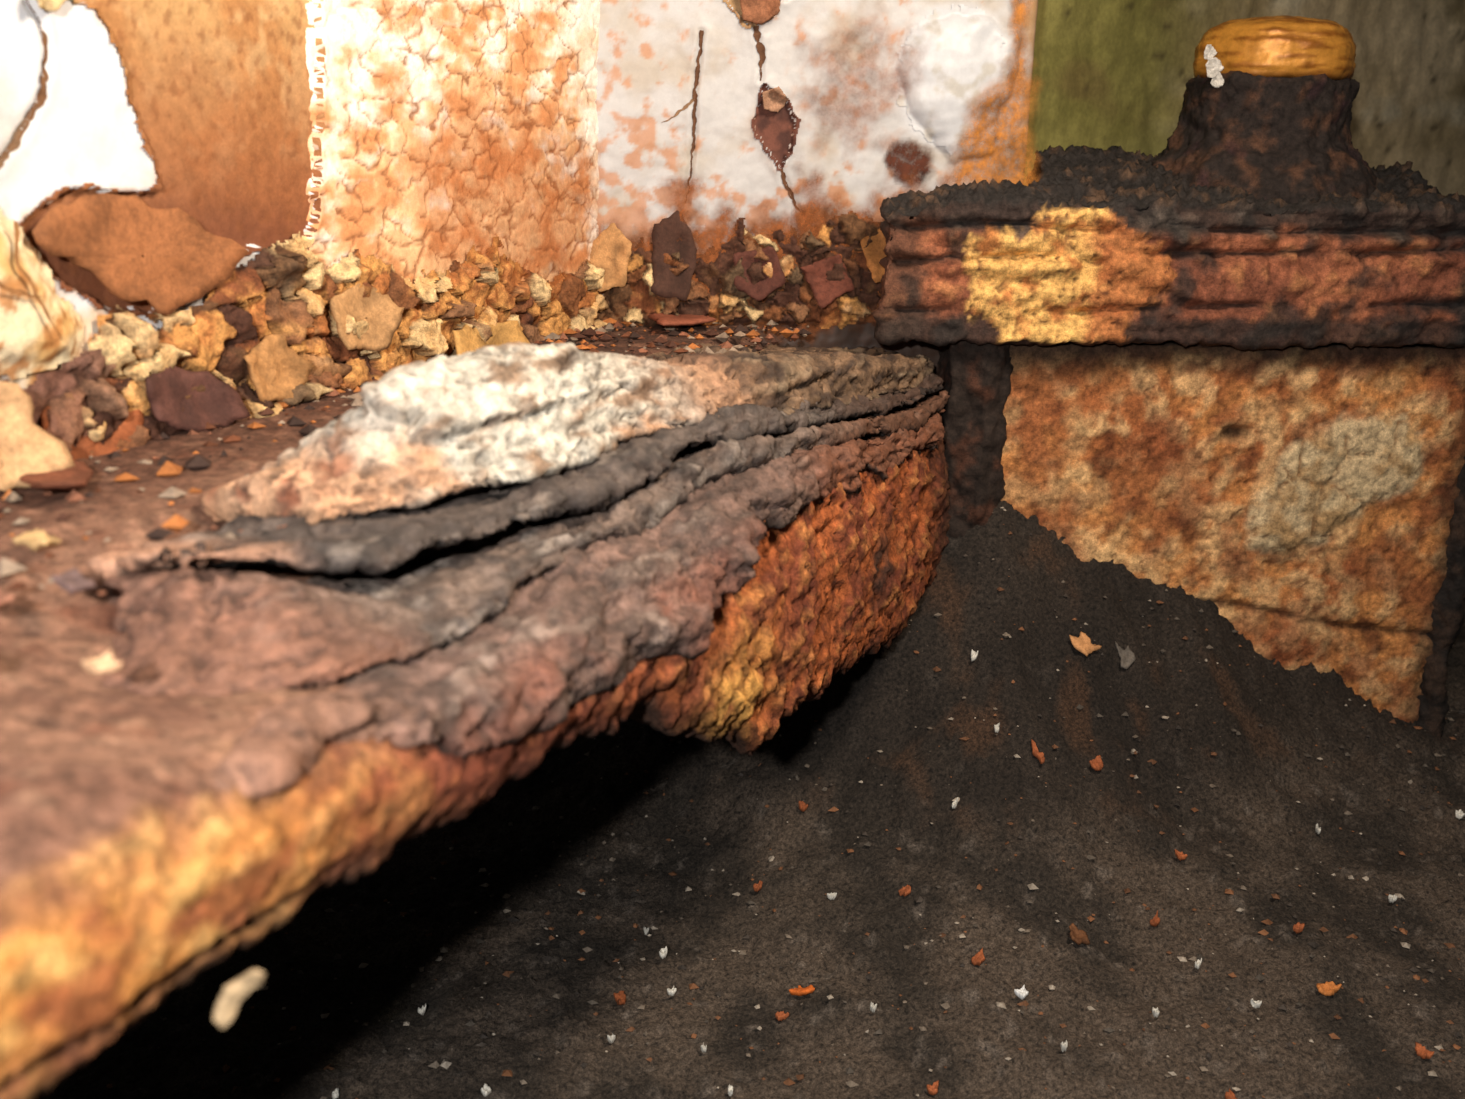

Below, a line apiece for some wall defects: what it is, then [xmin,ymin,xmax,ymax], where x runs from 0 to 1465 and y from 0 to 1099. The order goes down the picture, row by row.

peeling [723,0,780,29]
crack [0,0,49,169]
peeling [19,0,327,323]
spalling [751,83,801,171]
rust [947,0,1033,186]
rust [0,382,75,491]
peeling [71,334,315,460]
rust [51,141,950,800]
rust [12,528,61,552]
rust [0,590,15,608]
rust [1069,632,1136,669]
rust [213,969,265,1029]